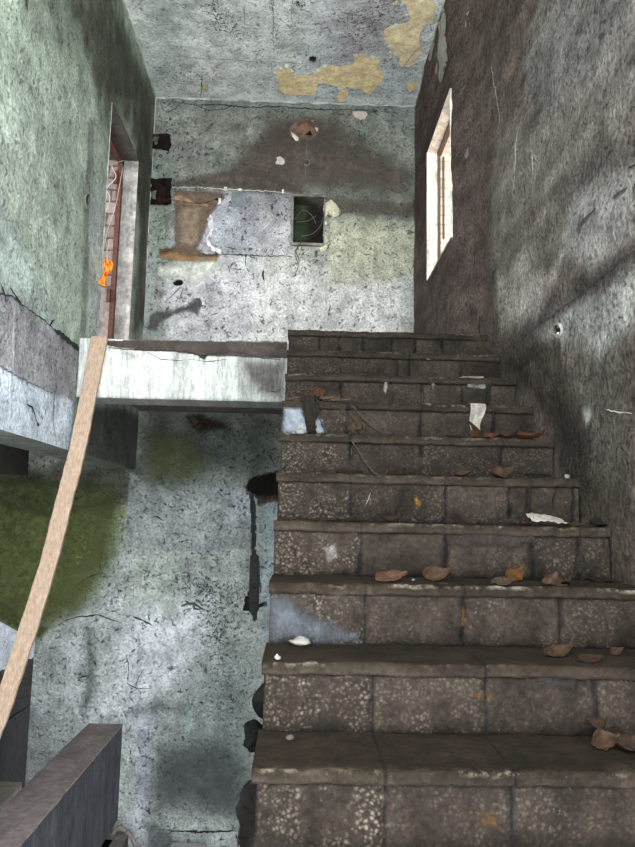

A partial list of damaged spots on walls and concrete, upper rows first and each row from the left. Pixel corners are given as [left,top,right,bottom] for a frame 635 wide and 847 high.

peeling [273,53,384,103]
peeling [380,0,448,92]
crack [0,284,79,351]